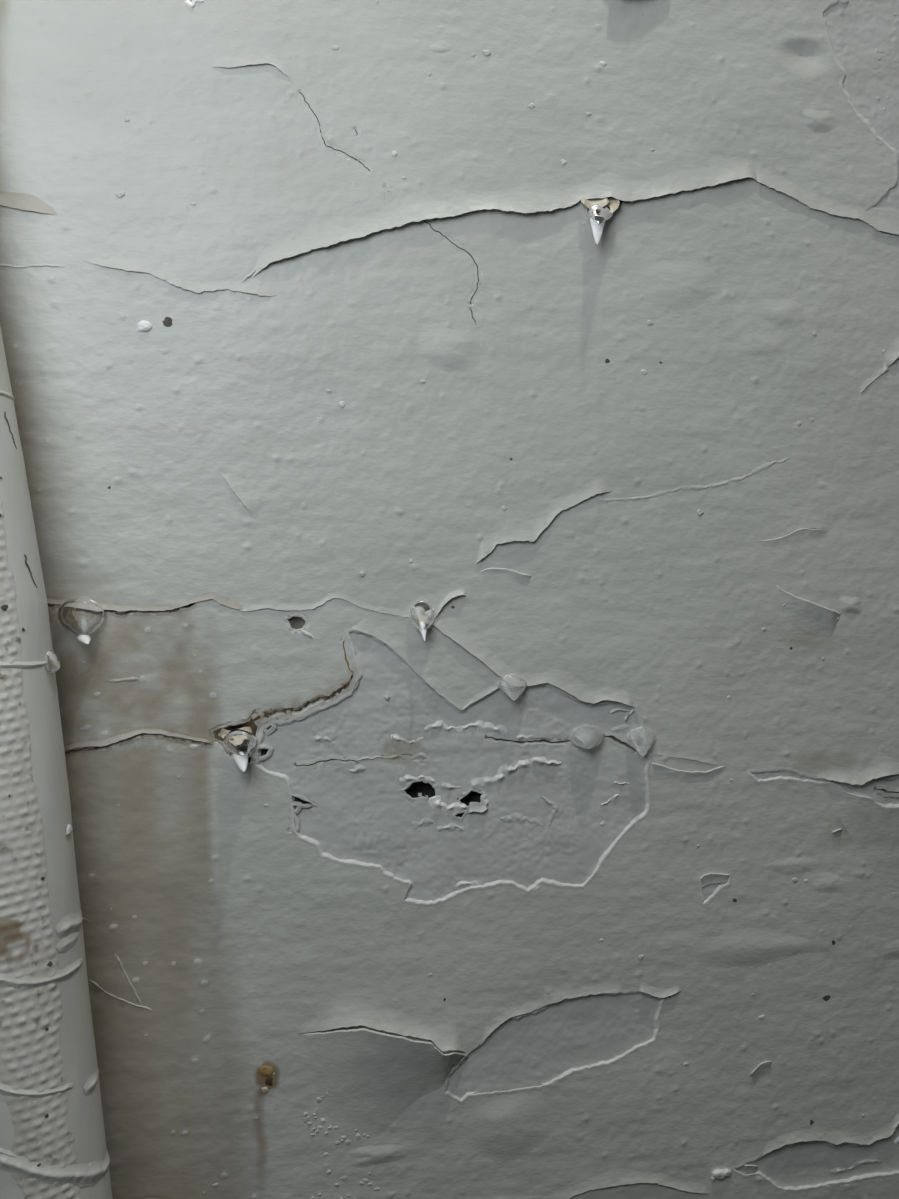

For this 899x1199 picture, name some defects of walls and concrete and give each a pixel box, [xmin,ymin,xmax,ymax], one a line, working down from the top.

peeling [211,48,295,84]
peeling [84,156,899,297]
peeling [860,335,899,393]
peeling [476,475,612,586]
peeling [776,585,841,638]
water stain [55,656,100,686]
spalling [209,605,726,908]
spalling [746,756,899,889]
rust [256,1064,278,1094]
spalling [297,980,681,1139]
peeling [464,1168,710,1199]
spalling [730,1110,899,1193]